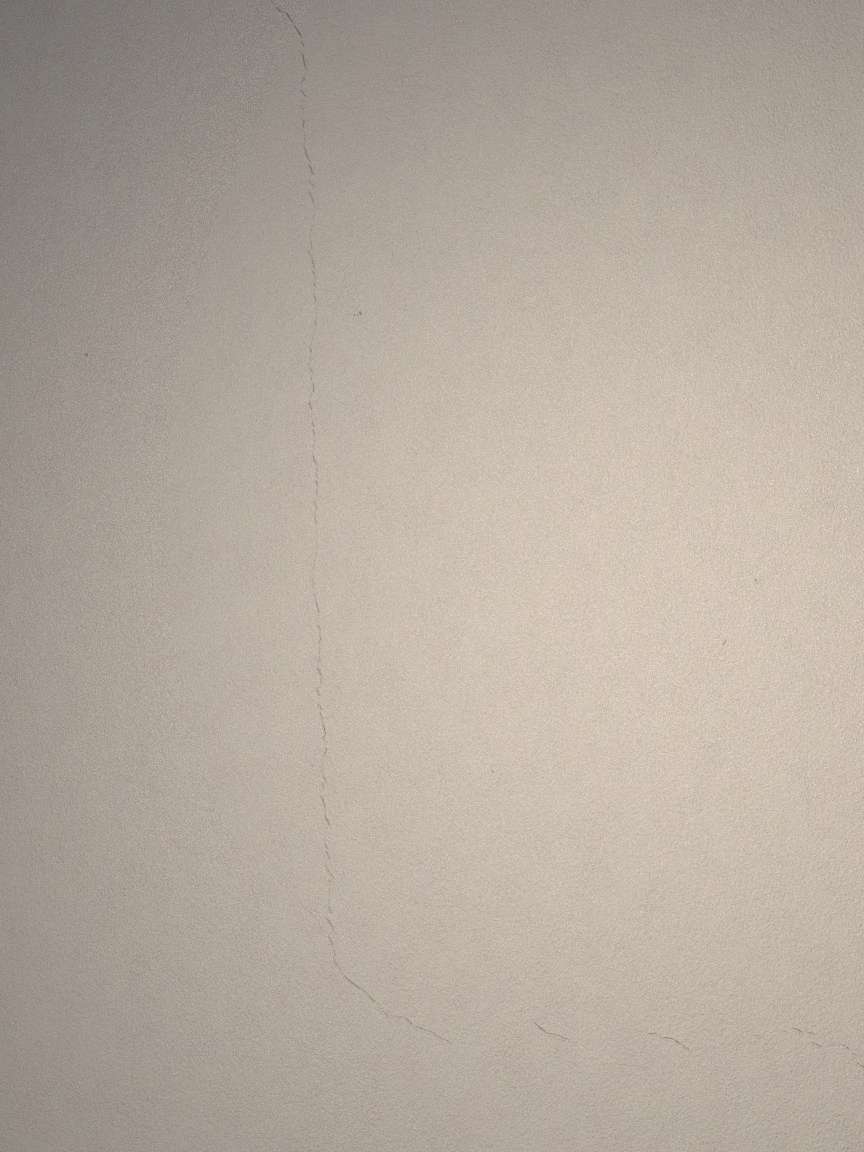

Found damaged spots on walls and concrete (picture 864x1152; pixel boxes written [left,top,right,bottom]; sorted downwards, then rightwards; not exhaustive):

crack [263,0,453,1045]
crack [498,1020,579,1045]
crack [647,1031,691,1052]
crack [753,1026,864,1071]